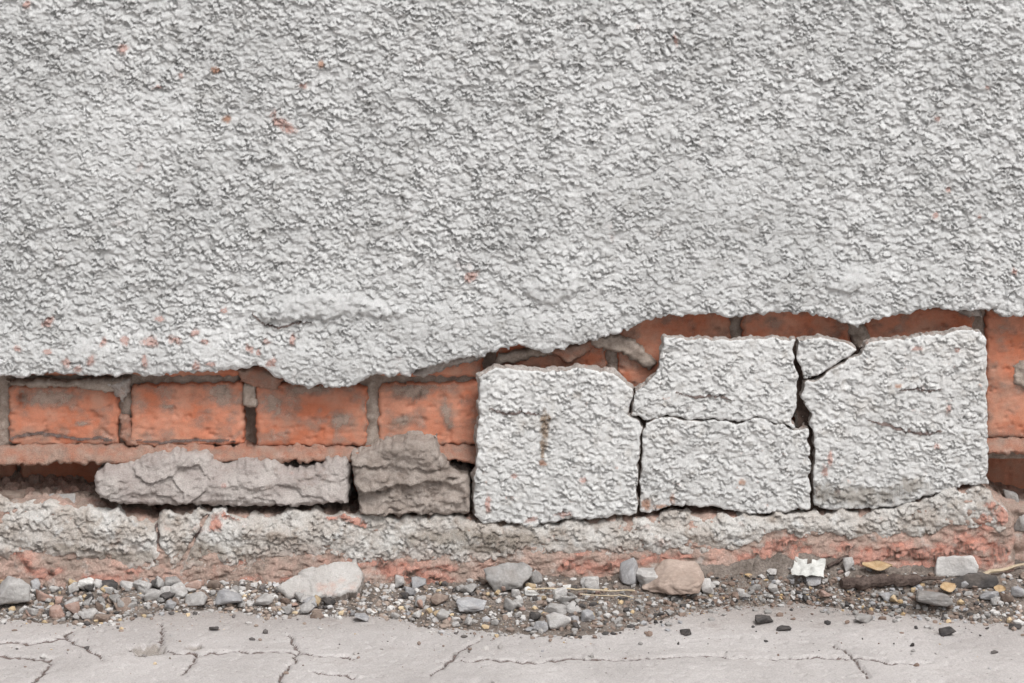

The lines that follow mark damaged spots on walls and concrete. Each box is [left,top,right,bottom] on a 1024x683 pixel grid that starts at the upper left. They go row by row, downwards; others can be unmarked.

spalling [837,318,874,349]
spalling [958,309,1003,318]
spalling [5,376,139,447]
spalling [209,365,328,415]
spalling [395,330,657,400]
rust [540,415,551,458]
crack [629,388,735,517]
crack [788,340,862,512]
spalling [1013,360,1024,389]
peeling [738,502,1010,568]
crack [278,636,300,683]
crack [430,645,472,676]